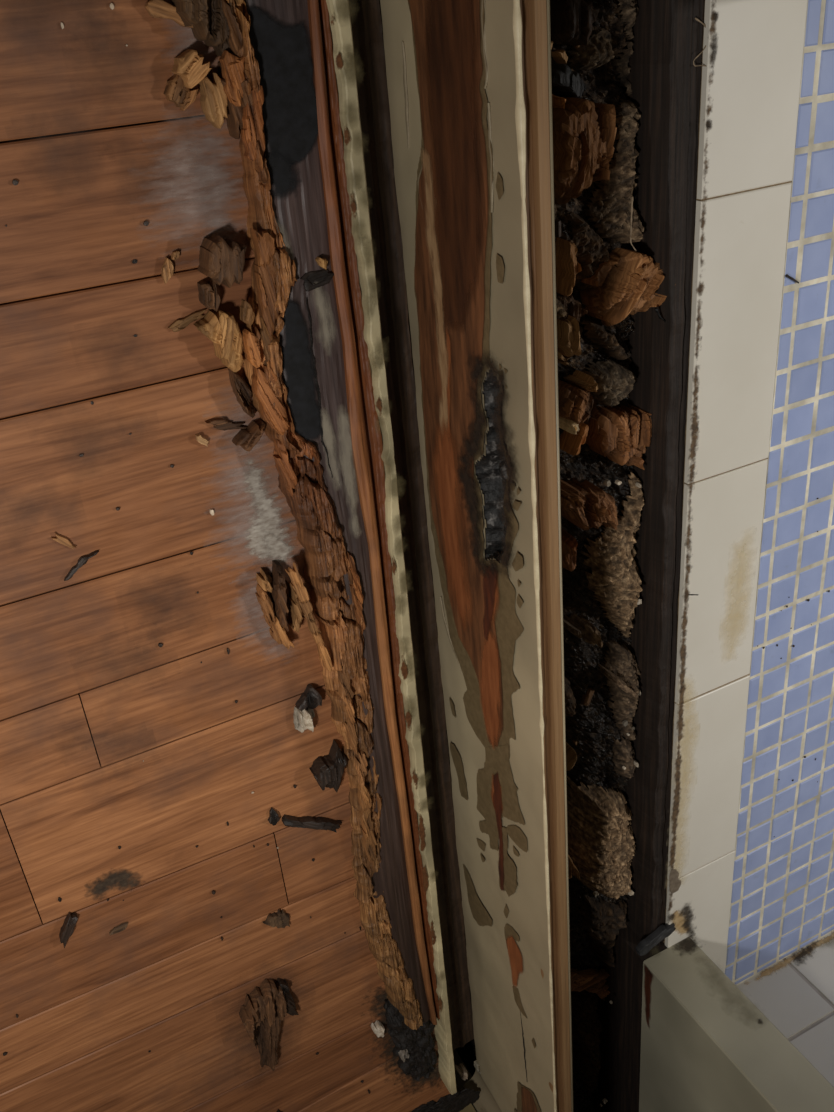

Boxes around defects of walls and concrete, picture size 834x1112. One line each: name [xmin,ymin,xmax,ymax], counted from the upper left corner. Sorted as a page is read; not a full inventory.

peeling [401,0,528,1018]
peeling [295,683,322,711]
peeling [309,739,347,792]
peeling [267,807,280,826]
leakage [794,943,816,963]
leakage [371,988,440,1092]
spalling [453,1050,472,1093]
peeling [514,1082,541,1112]